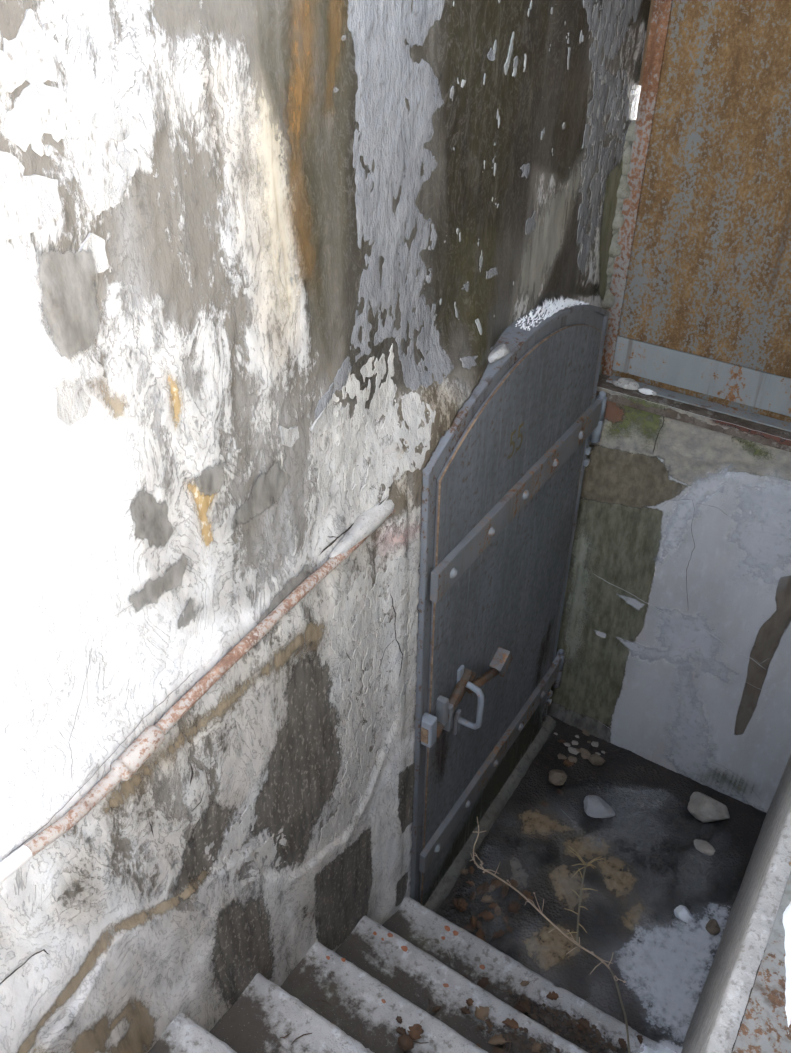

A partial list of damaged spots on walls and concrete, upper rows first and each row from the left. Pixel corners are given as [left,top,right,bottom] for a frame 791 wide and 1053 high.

peeling [0,8,137,215]
peeling [487,32,527,77]
peeling [565,0,643,274]
peeling [315,0,478,515]
peeling [478,239,498,279]
water stain [520,166,582,314]
water stain [599,158,623,300]
peeling [551,387,791,763]
water stain [102,622,341,871]
crack [0,949,50,984]
water stain [212,891,275,1009]
water stain [314,829,373,950]